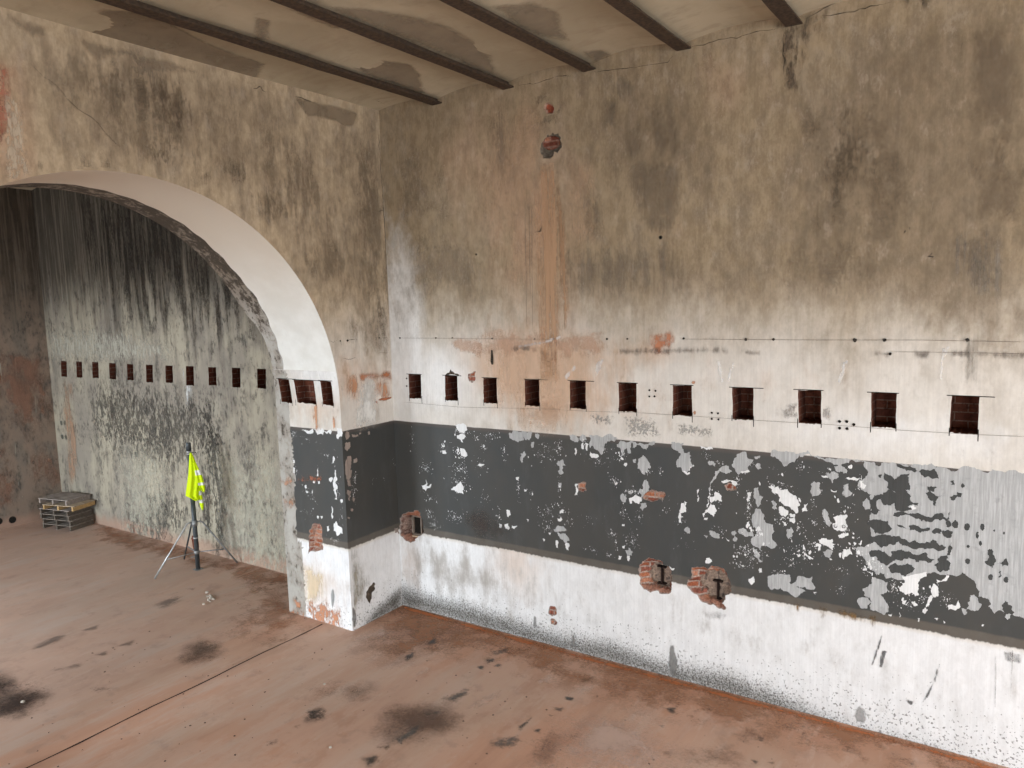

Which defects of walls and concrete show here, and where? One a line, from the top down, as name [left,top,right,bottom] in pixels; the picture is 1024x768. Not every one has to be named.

water stain [359,61,422,92]
water stain [341,9,493,75]
crack [594,28,786,72]
crack [809,2,890,17]
water stain [298,100,356,125]
spalling [540,133,562,159]
rust [655,334,671,353]
water stain [95,374,227,555]
spalling [291,428,370,554]
spalling [394,462,436,543]
peeling [441,423,1024,625]
water stain [353,565,875,732]